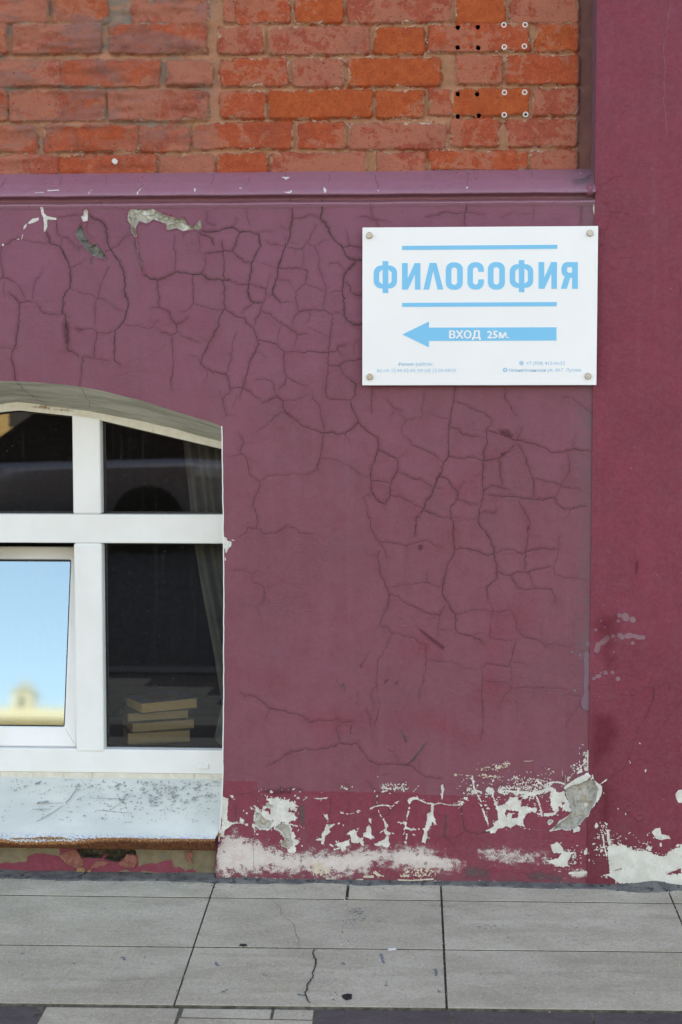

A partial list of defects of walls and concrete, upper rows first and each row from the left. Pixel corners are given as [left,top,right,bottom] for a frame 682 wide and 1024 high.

peeling [17,207,56,240]
flaking render [73,208,107,260]
flaking render [126,208,203,275]
crack [0,174,588,857]
peeling [0,779,333,880]
flaking render [316,744,682,885]
crack [275,903,317,1003]